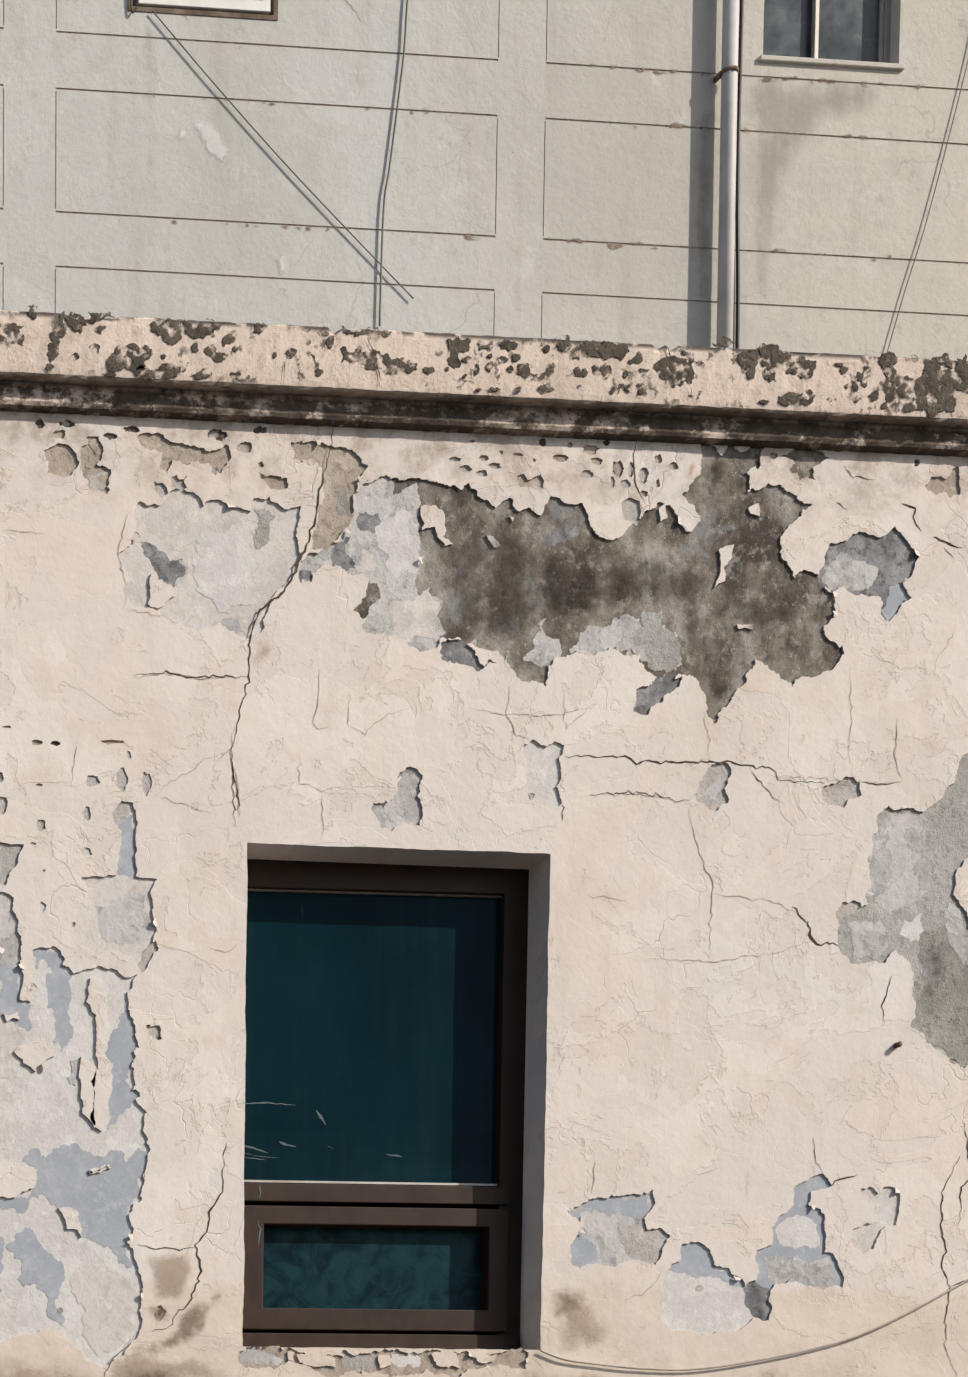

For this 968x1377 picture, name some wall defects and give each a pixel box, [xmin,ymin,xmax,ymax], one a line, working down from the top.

crack [118,515,176,623]
crack [133,431,333,825]
flaking render [35,420,921,724]
peeling [822,777,861,808]
flaking render [836,753,968,1068]
peeling [0,740,166,1367]
water stain [115,1357,208,1377]
water stain [156,1258,189,1316]
flaking render [238,1346,529,1377]
peeling [568,1174,843,1335]
peeling [852,1187,900,1253]
crack [940,1123,968,1376]